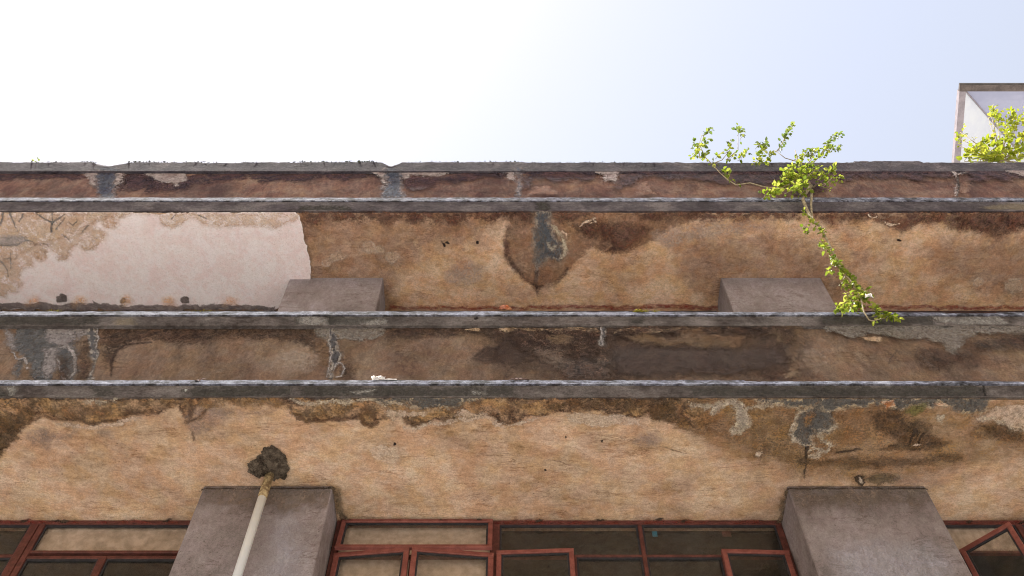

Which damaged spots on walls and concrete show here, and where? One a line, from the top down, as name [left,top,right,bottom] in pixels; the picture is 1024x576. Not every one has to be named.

peeling [0,212,311,330]
damp [0,202,1024,508]
peeling [824,304,1024,355]